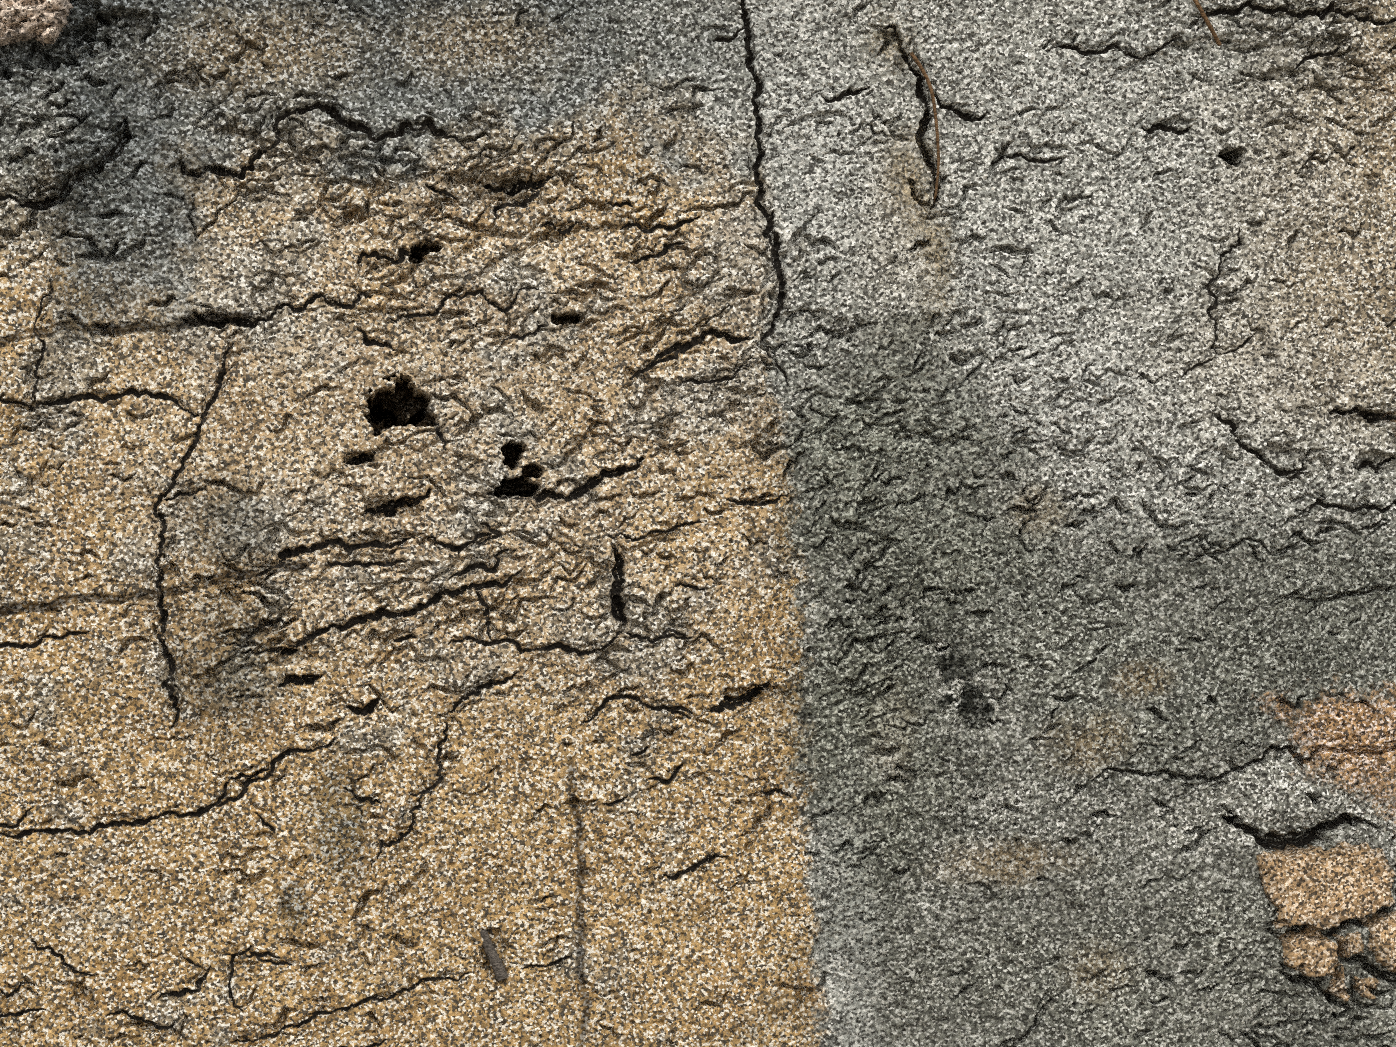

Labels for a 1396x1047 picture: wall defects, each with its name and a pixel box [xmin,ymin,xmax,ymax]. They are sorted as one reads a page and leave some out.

crack [1046,0,1396,70]
crack [181,102,471,180]
crack [426,173,580,236]
crack [607,201,699,264]
crack [630,0,788,385]
crack [0,238,545,728]
crack [227,457,704,867]
crack [583,682,770,724]
crack [0,697,380,840]
peeling [1256,841,1396,1009]
crack [0,939,95,1018]
crack [108,946,470,1043]